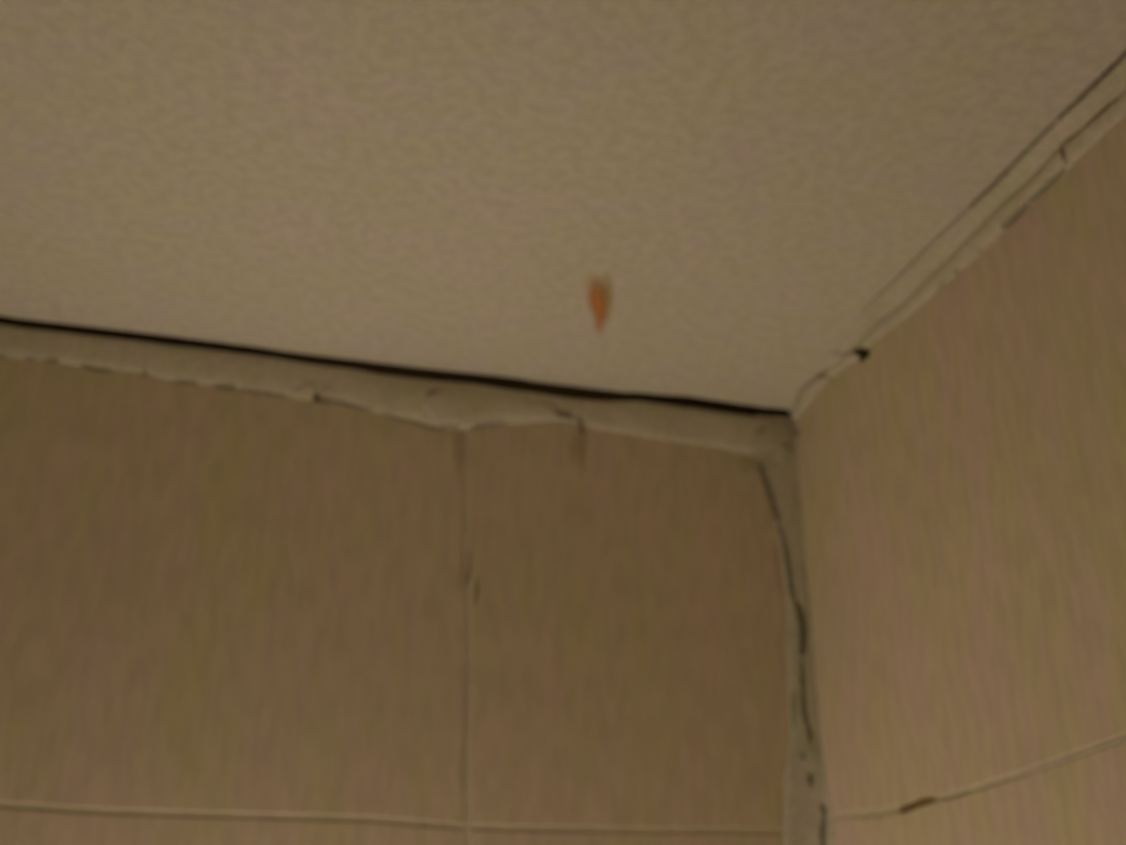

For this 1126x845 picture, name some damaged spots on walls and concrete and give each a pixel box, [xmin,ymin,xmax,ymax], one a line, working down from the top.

crack [0,316,791,418]